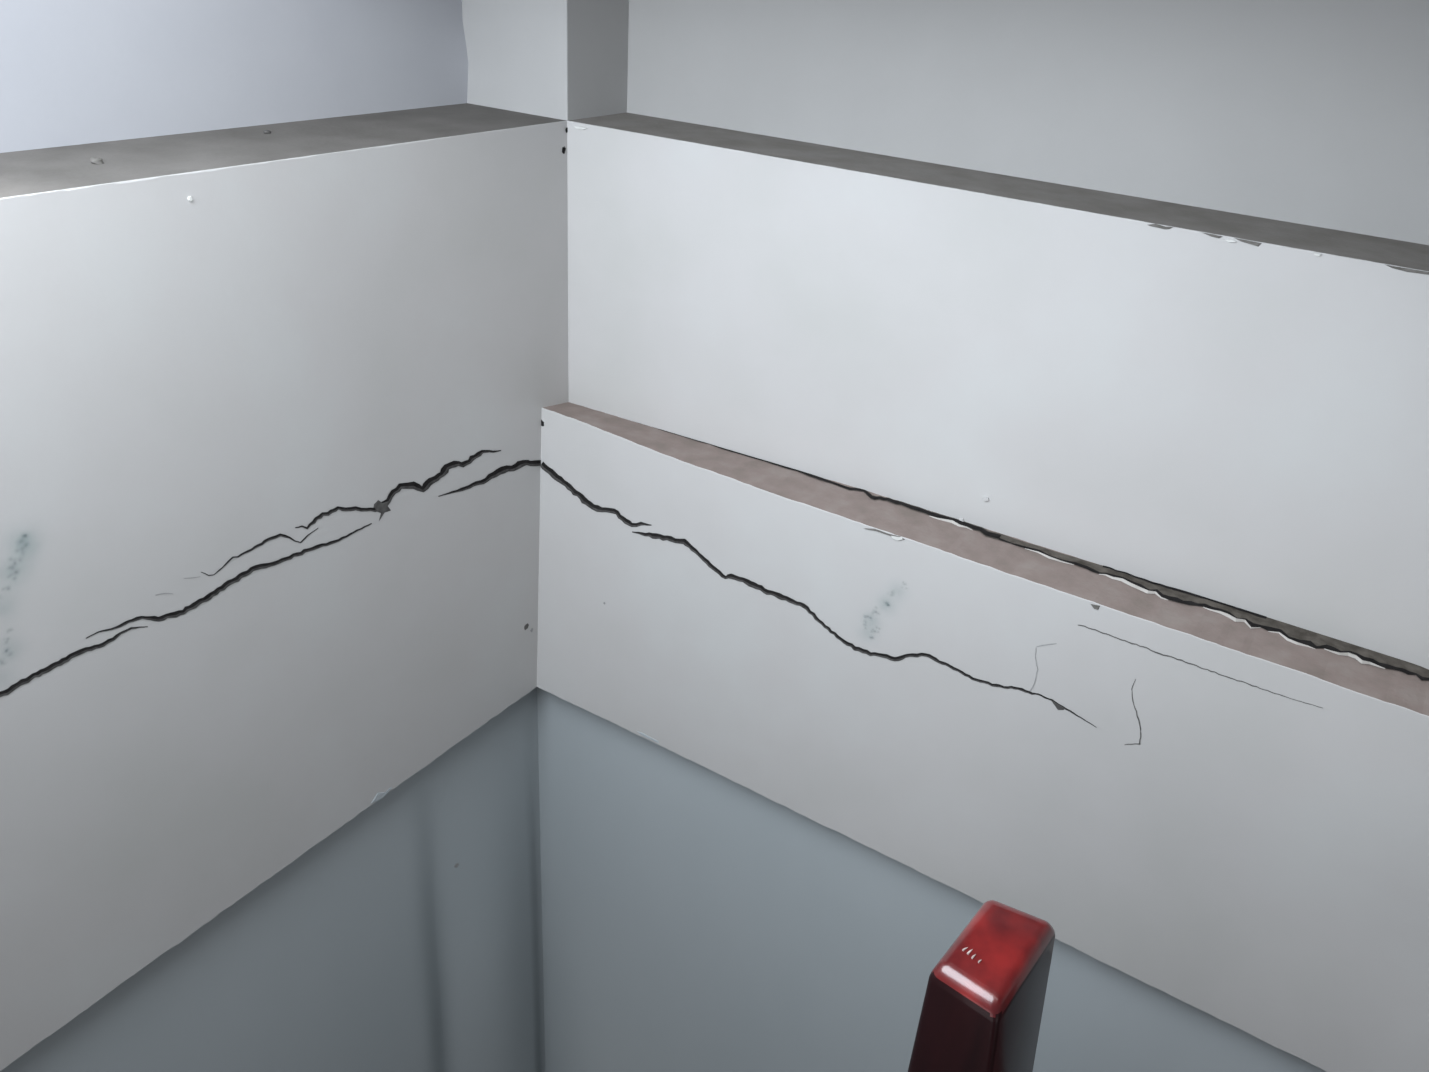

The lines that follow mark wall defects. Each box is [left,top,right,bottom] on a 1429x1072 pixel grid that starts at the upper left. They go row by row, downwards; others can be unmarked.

crack [0,450,1322,745]
crack [639,423,1429,680]